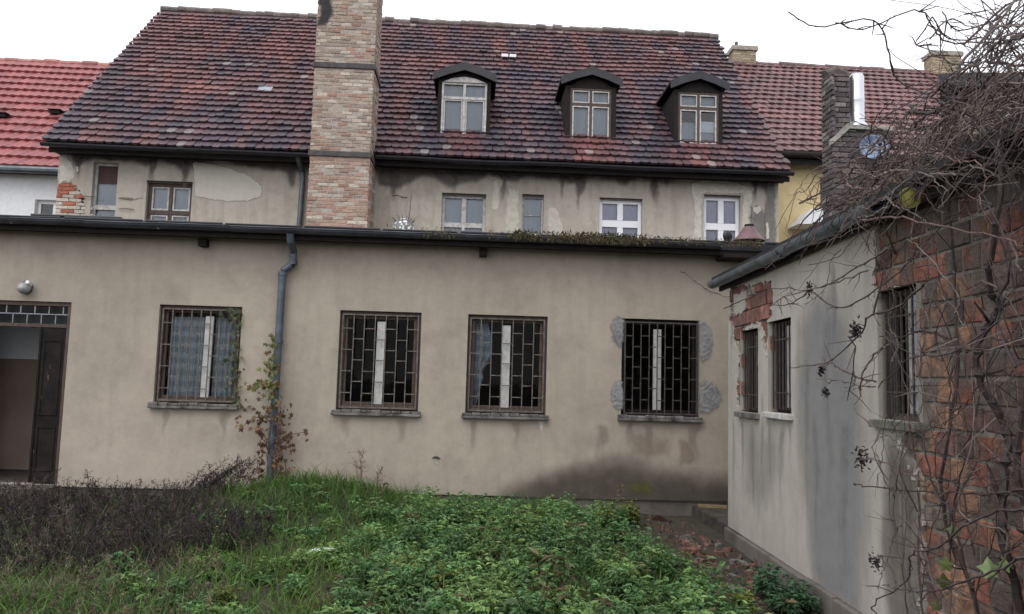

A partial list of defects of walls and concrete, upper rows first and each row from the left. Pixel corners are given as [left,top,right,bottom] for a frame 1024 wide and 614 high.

spalling [55,155,93,216]
damp [492,172,519,233]
damp [548,207,563,235]
spalling [729,281,773,412]
damp [511,466,728,502]
damp [803,308,859,603]